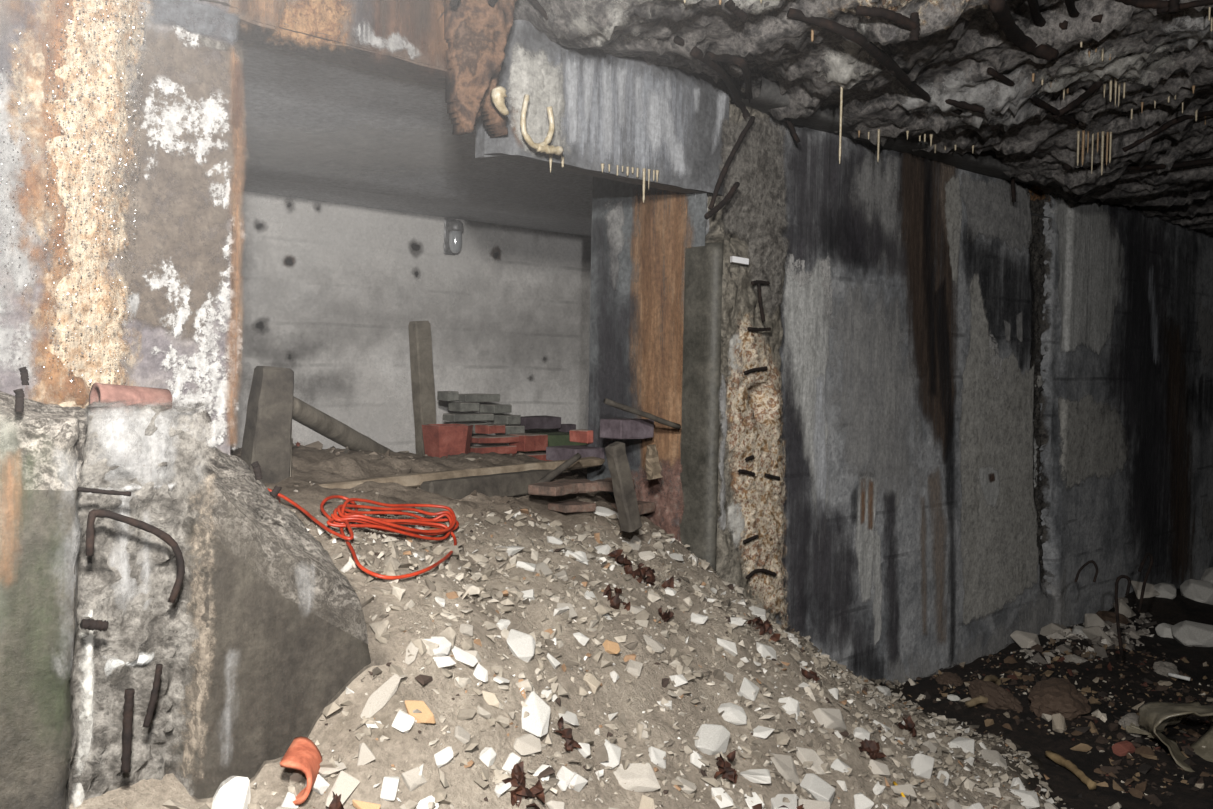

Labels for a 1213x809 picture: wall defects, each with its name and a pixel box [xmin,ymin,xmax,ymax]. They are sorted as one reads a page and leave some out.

leakage [117,2,245,339]
crack [206,0,239,10]
corrosion [368,0,565,154]
spalling [787,5,985,115]
spalling [987,67,1015,87]
spalling [988,0,1103,61]
spalling [1029,79,1103,125]
spalling [1117,0,1213,14]
peeling [0,367,29,569]
spalling [673,36,800,628]
leakage [779,131,1068,685]
leakage [1109,205,1213,584]